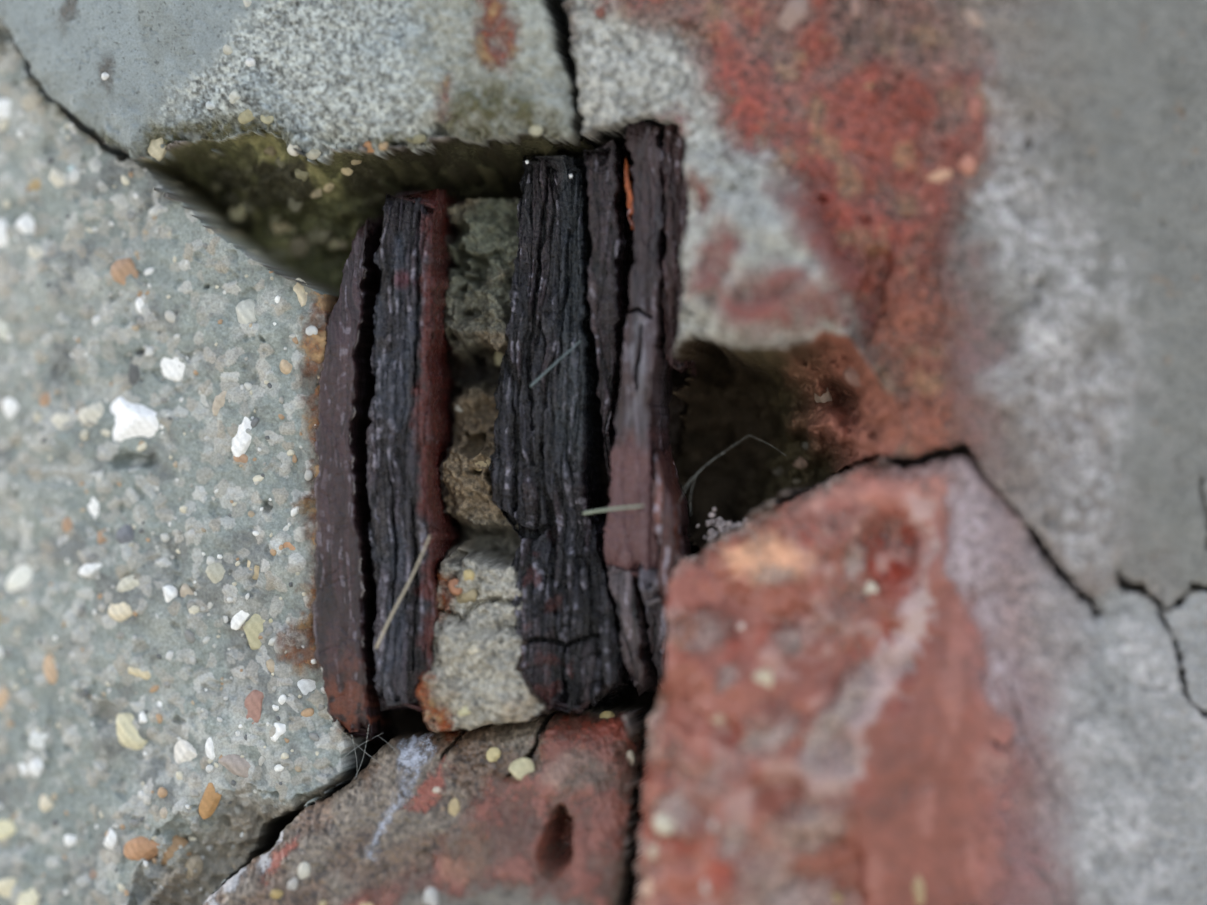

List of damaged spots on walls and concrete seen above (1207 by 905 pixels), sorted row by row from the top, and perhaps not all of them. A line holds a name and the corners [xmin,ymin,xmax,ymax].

crack [4,25,129,163]
crack [544,0,599,148]
corrosion [278,189,460,745]
corrosion [489,120,697,715]
peeling [348,0,1070,905]
crack [776,441,1207,719]
crack [244,762,370,869]
crack [622,689,660,905]